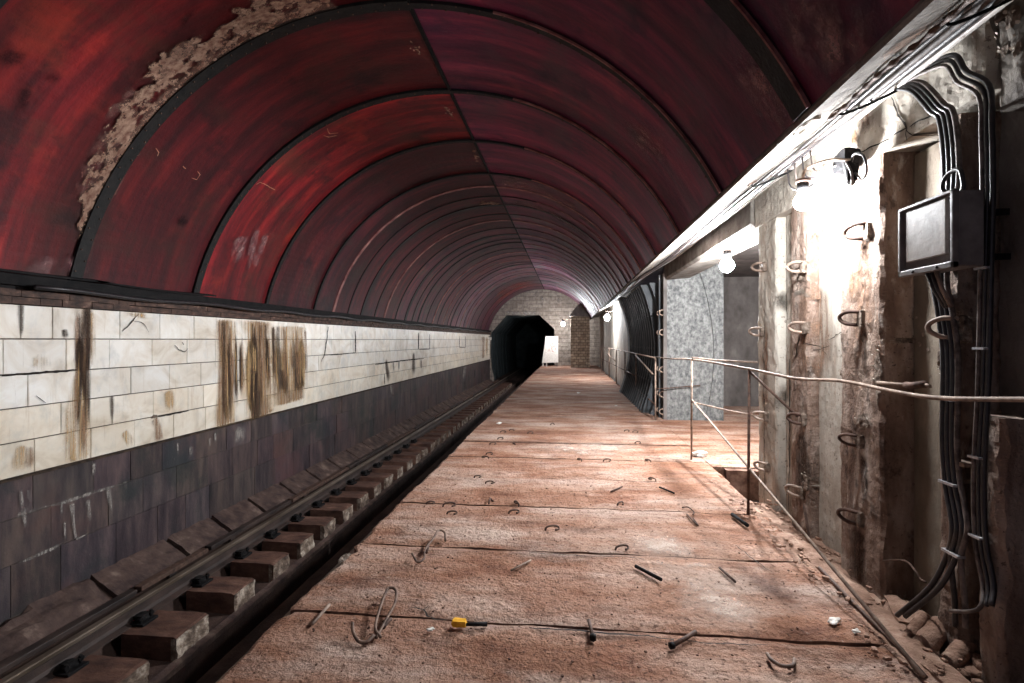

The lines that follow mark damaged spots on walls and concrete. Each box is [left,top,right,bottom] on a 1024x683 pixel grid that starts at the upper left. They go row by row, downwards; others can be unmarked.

peeling [70,0,335,236]
rust [67,308,93,461]
rust [217,320,244,425]
rust [276,327,307,404]